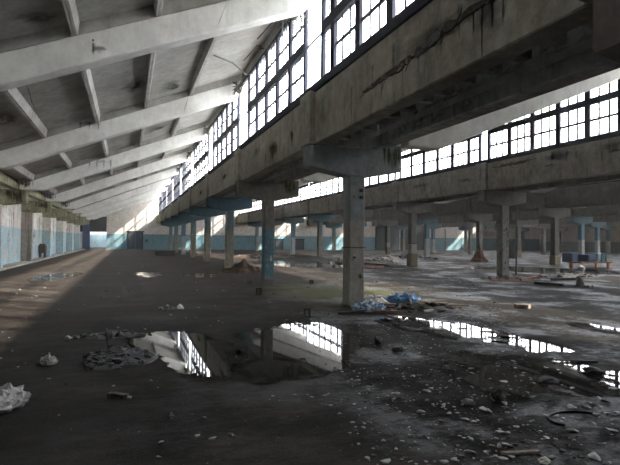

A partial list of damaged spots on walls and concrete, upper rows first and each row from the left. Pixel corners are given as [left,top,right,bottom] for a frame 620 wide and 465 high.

crack [351,0,496,98]